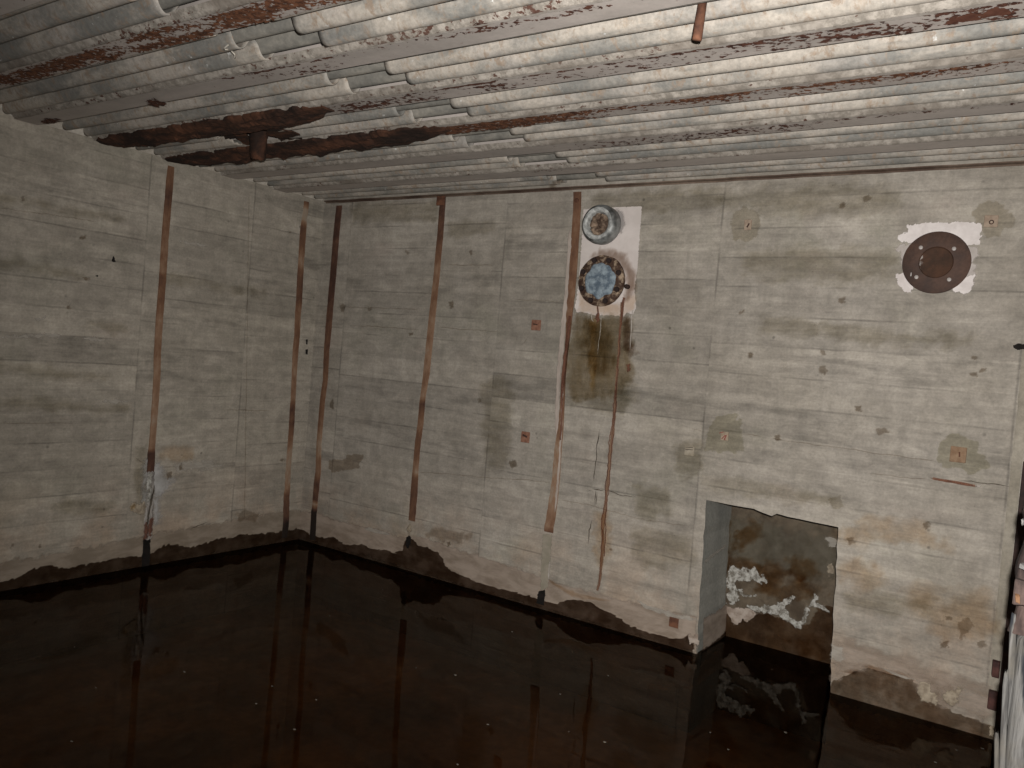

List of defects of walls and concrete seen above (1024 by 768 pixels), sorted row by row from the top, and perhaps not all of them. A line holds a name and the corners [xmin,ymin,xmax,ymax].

rust [328,2,1024,113]
rust [444,61,1024,135]
rust [568,121,823,150]
peeling [896,243,913,293]
peeling [953,246,978,294]
rust [596,297,631,591]
spalling [143,471,155,540]
water stain [0,459,837,654]
water stain [829,639,995,739]